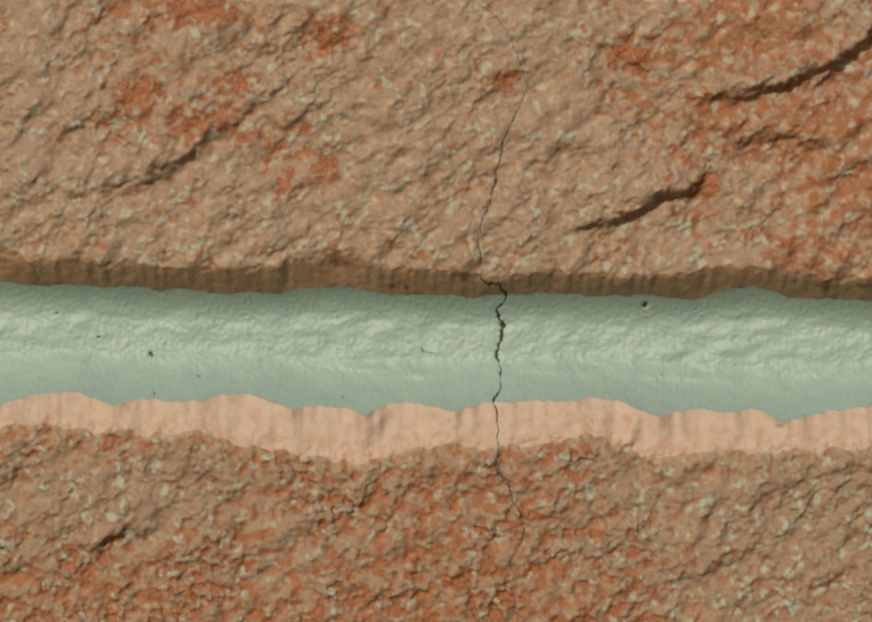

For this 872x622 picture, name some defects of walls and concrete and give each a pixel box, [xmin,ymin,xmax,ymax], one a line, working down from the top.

crack [473,0,528,622]